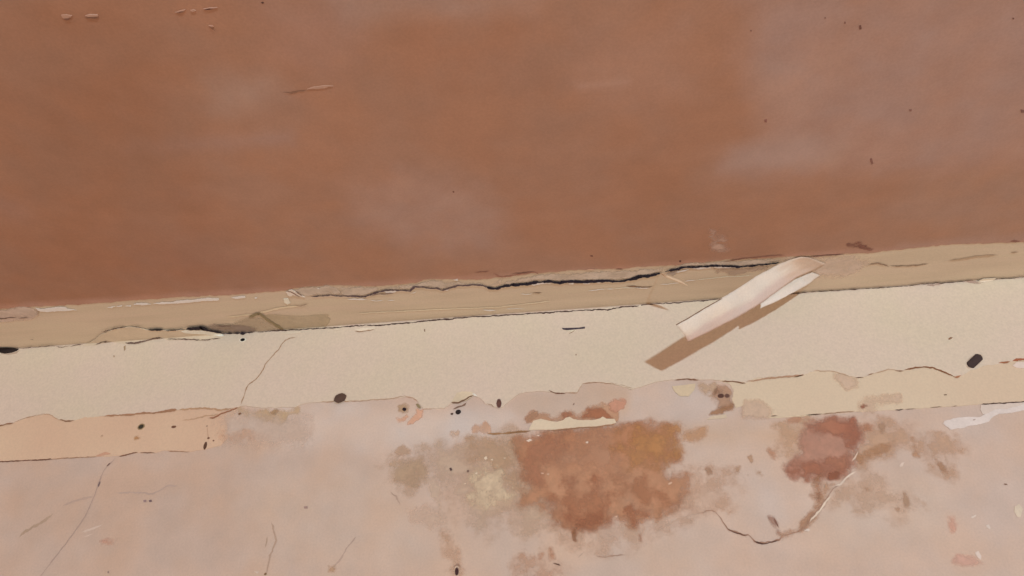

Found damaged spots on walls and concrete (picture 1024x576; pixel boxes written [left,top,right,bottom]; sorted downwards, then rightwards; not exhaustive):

crack [0,254,843,420]
peeling [0,257,1024,462]
crack [792,252,1019,294]
corrosion [513,399,705,545]
crack [657,452,858,544]
corrosion [779,405,864,528]